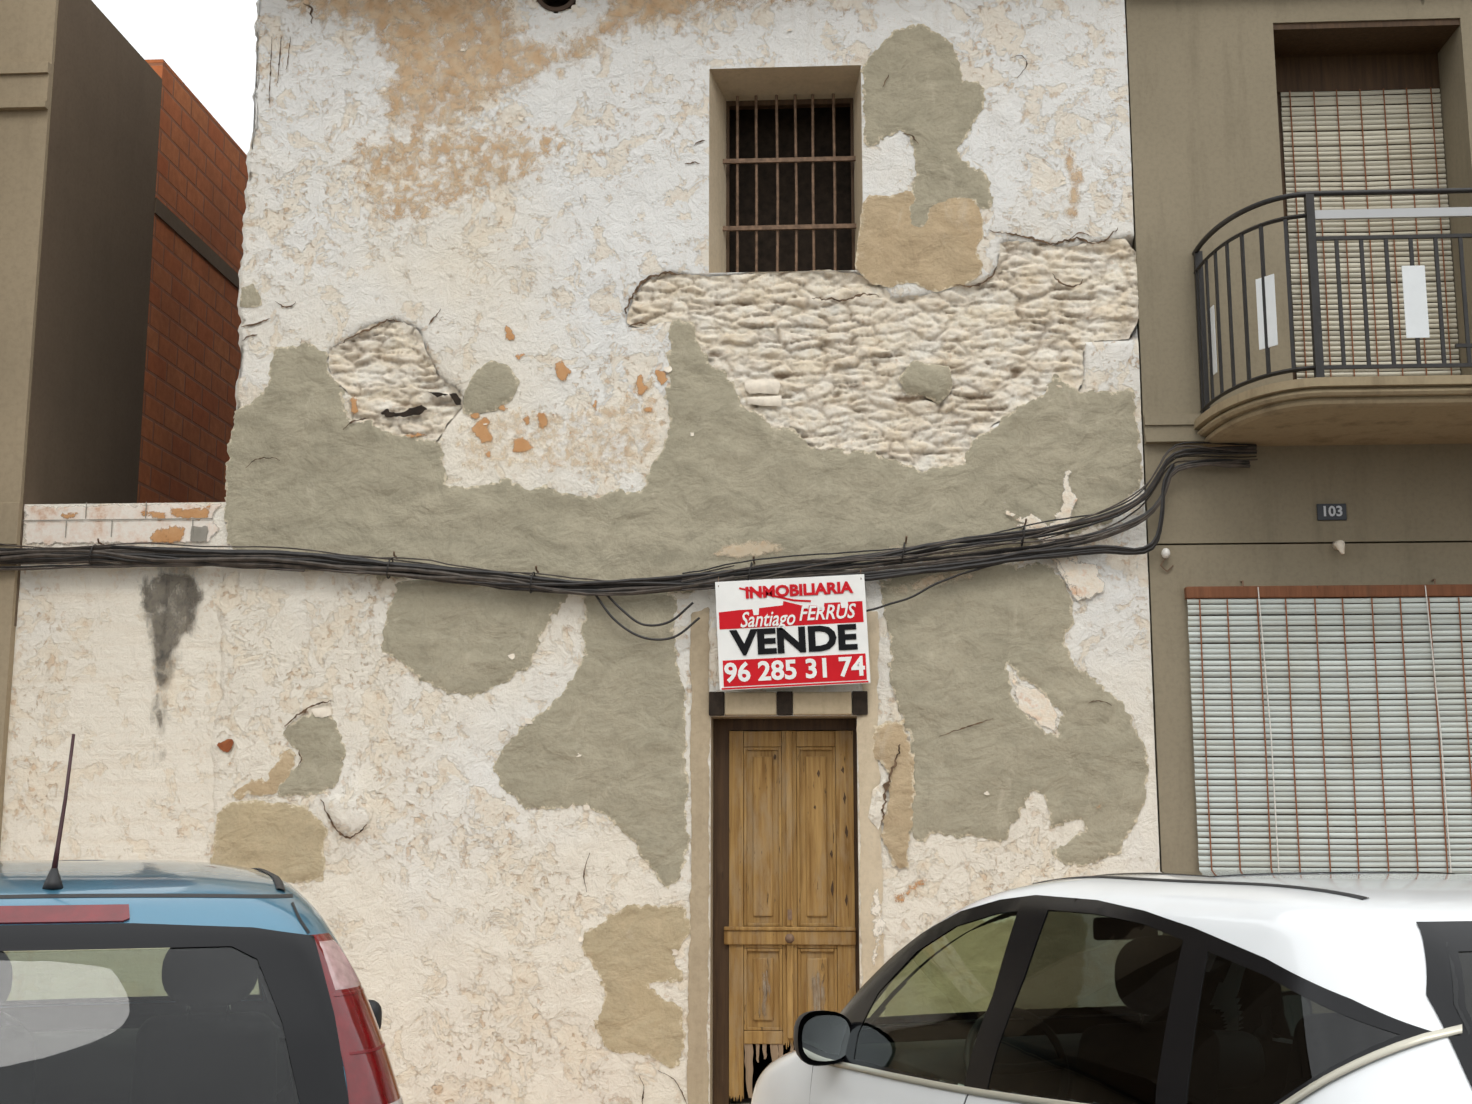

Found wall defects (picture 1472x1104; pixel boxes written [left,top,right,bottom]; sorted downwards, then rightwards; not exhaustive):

spalling [329,322,672,488]
spalling [627,191,1139,473]
damp [141,574,202,722]
peeling [210,700,346,883]
peeling [868,718,926,902]
peeling [579,900,691,1104]